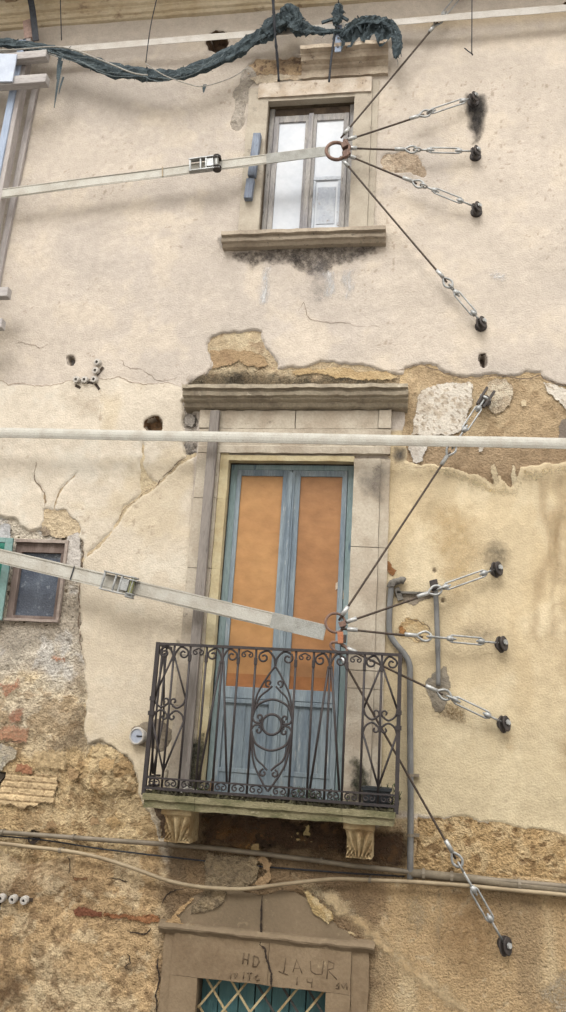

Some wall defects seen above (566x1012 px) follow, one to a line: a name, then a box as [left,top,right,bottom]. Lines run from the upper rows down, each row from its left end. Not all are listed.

spalling [230,57,302,131]
damp [233,246,375,296]
crack [0,362,178,386]
damp [227,372,243,384]
spalling [192,331,566,495]
crack [34,468,77,512]
spalling [0,507,84,567]
crack [78,444,197,649]
spalling [0,566,166,865]
spalling [414,816,566,881]
flaking render [73,898,194,925]
crack [259,895,273,988]